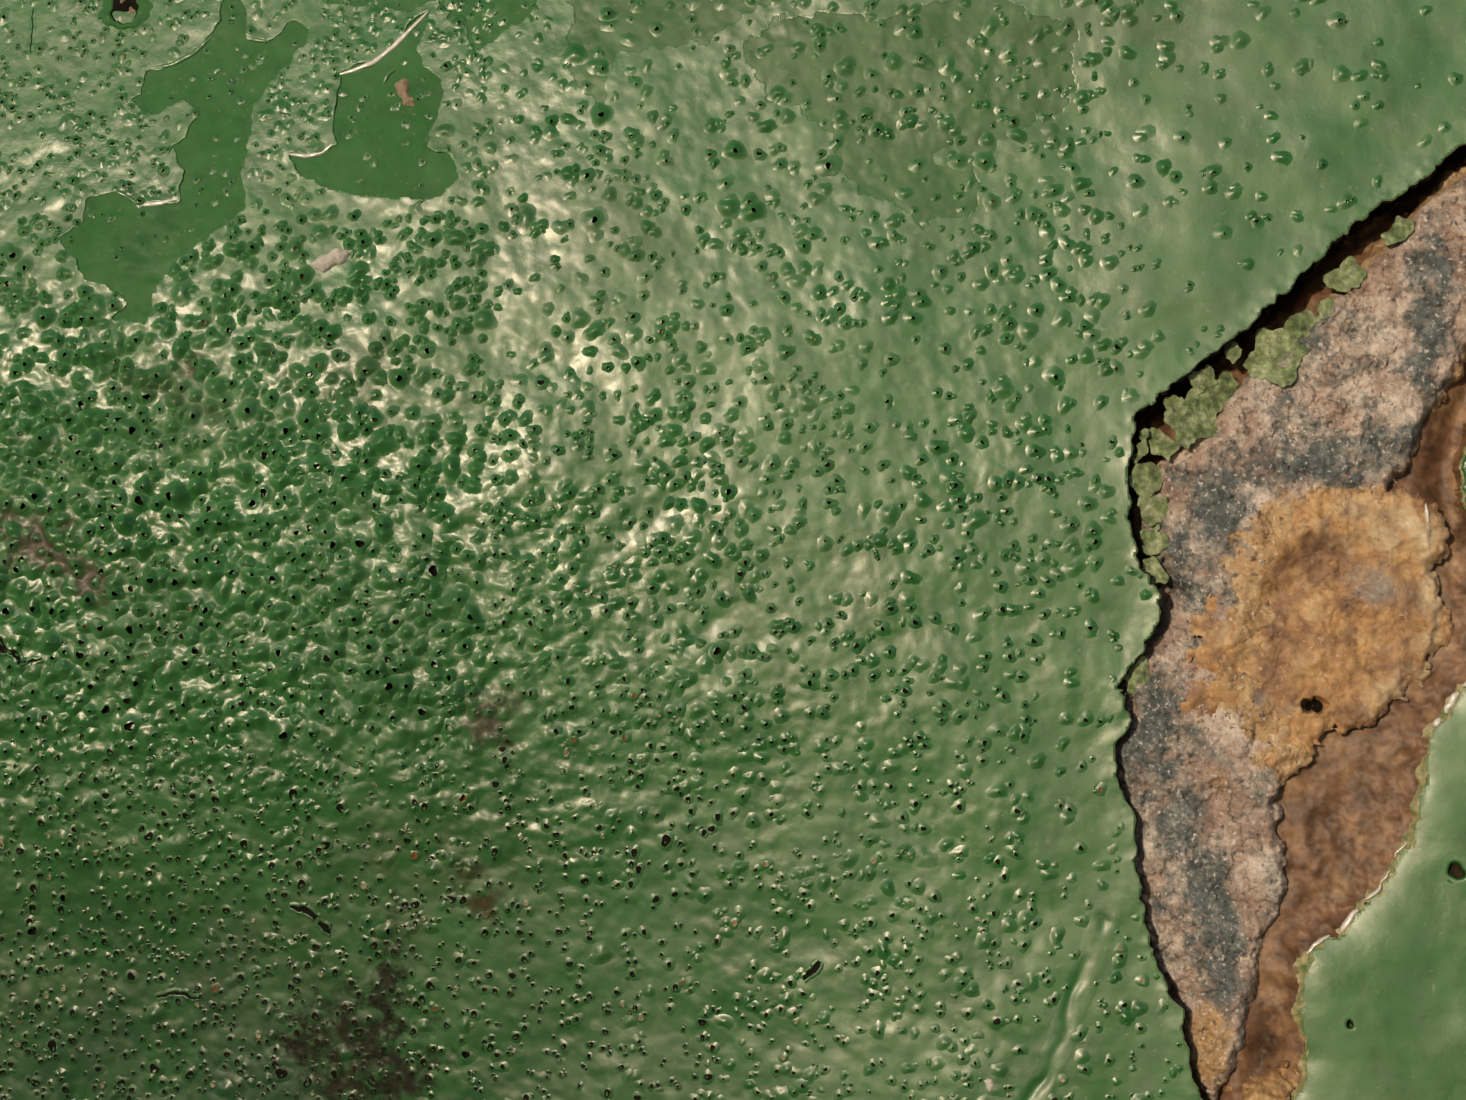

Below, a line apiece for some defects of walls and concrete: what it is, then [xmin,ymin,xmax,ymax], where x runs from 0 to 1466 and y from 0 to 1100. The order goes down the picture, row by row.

peeling [60,0,308,325]
peeling [289,0,538,200]
crack [0,633,45,689]
spalling [1115,145,1466,1100]